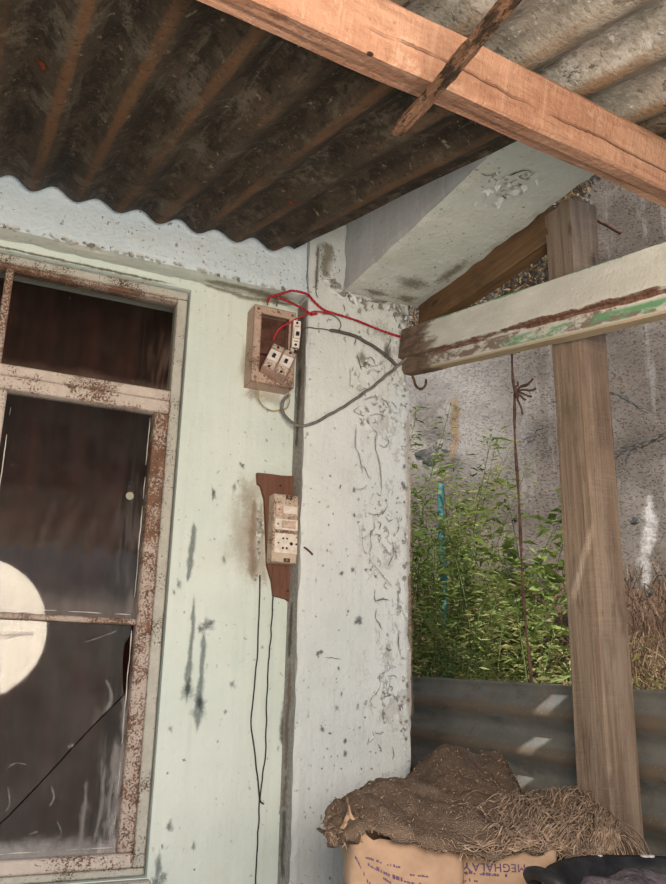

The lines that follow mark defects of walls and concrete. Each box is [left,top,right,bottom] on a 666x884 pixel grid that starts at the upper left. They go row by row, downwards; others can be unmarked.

peeling [474,170,539,209]
damp [173,525,195,593]
peeling [360,507,408,594]
damp [184,605,213,727]